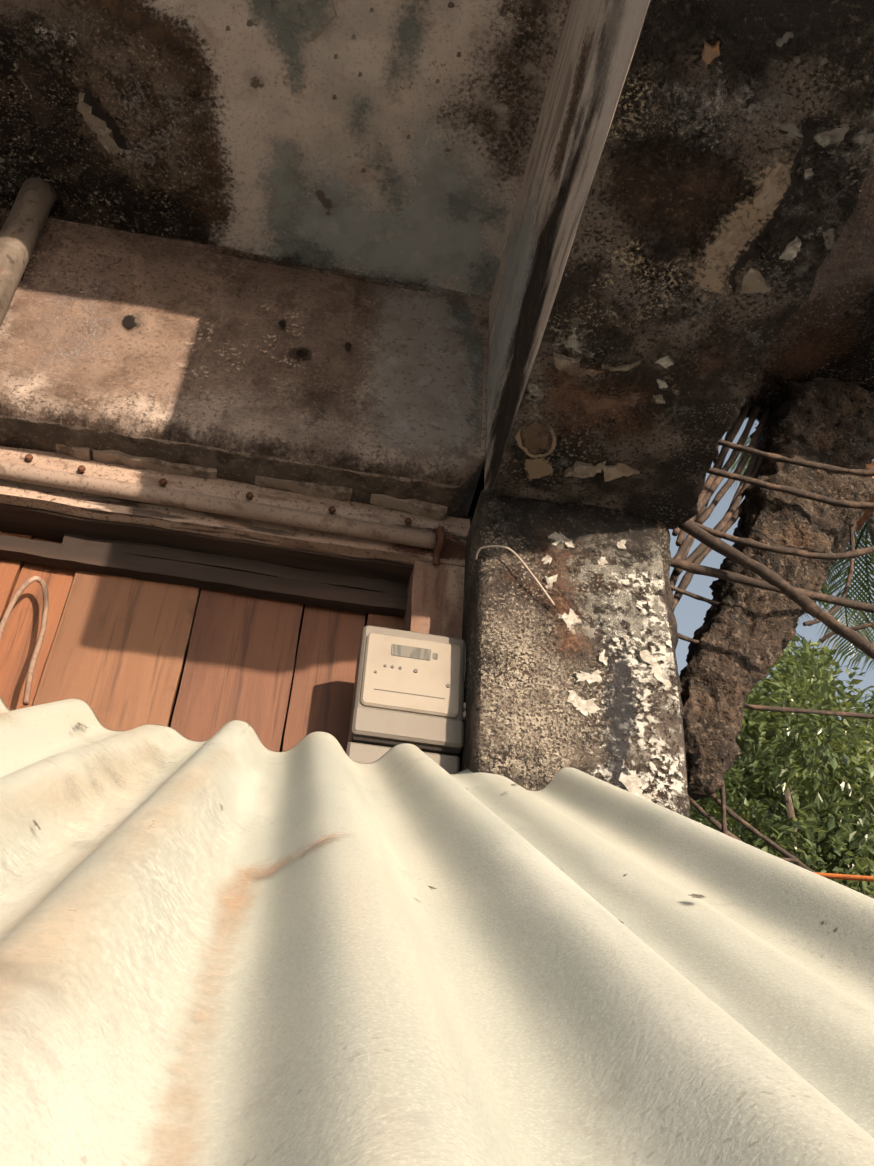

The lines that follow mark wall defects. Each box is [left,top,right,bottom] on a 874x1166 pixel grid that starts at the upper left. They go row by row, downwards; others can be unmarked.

spalling [77,88,128,154]
water stain [0,0,620,493]
water stain [598,137,742,247]
peeling [682,112,874,307]
peeling [553,351,641,377]
peeling [592,355,674,406]
peeling [564,461,640,482]
peeling [541,531,576,590]
peeling [557,609,608,717]
spalling [638,377,874,872]